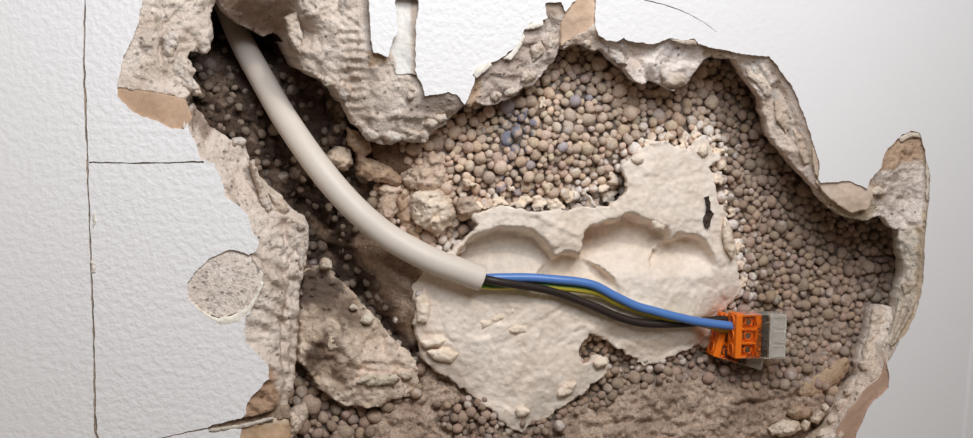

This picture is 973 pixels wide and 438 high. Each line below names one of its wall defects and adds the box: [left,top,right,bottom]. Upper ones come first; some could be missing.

crack [83,6,204,438]
crack [162,404,292,438]
peeling [237,418,291,438]
flaking render [117,0,464,419]
crack [645,0,715,31]
flaking render [465,0,930,438]